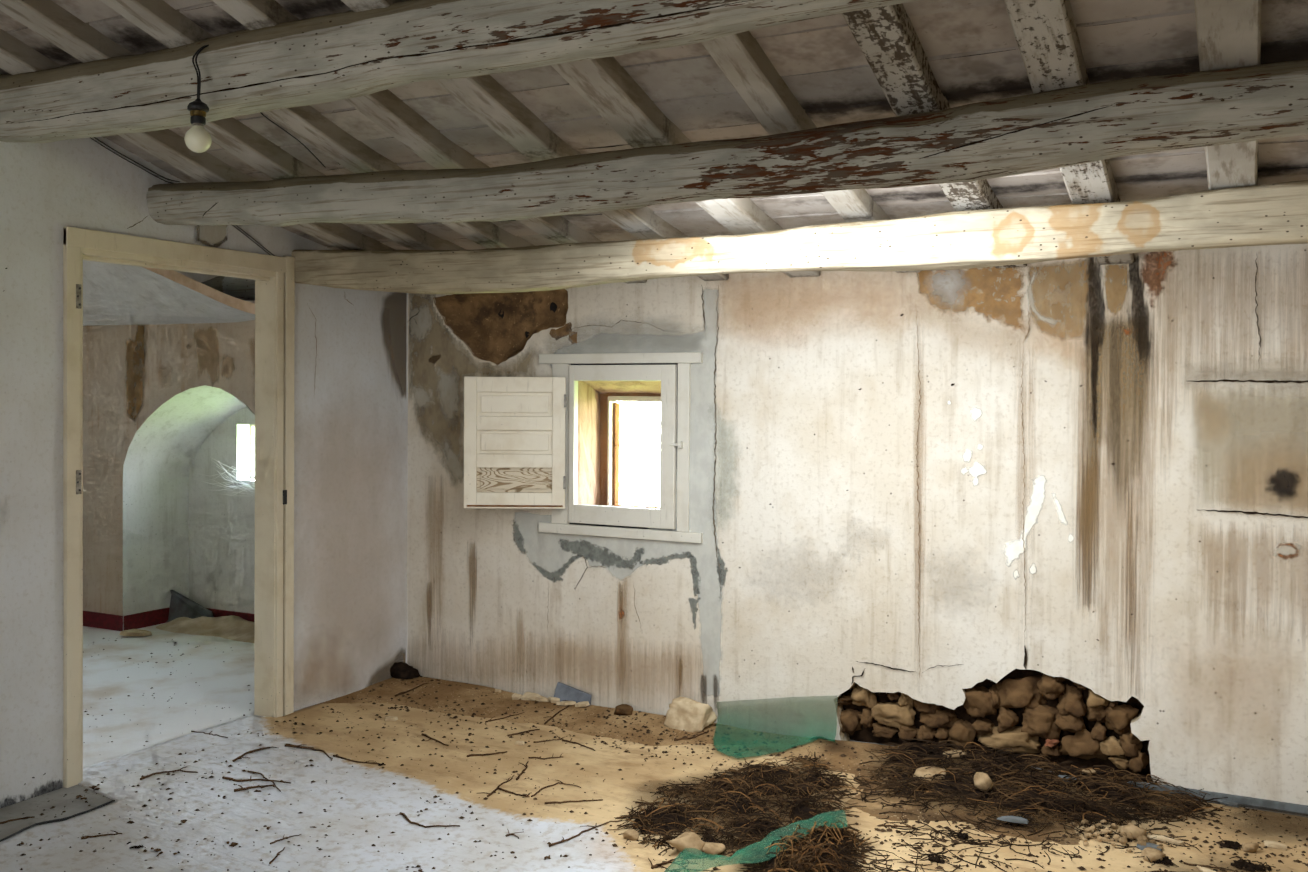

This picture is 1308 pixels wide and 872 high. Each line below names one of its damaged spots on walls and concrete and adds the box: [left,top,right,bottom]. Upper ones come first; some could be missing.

flaking render [433,289,577,365]
damp [1079,256,1150,619]
peeling [1004,476,1074,579]
flaking render [837,669,1154,783]